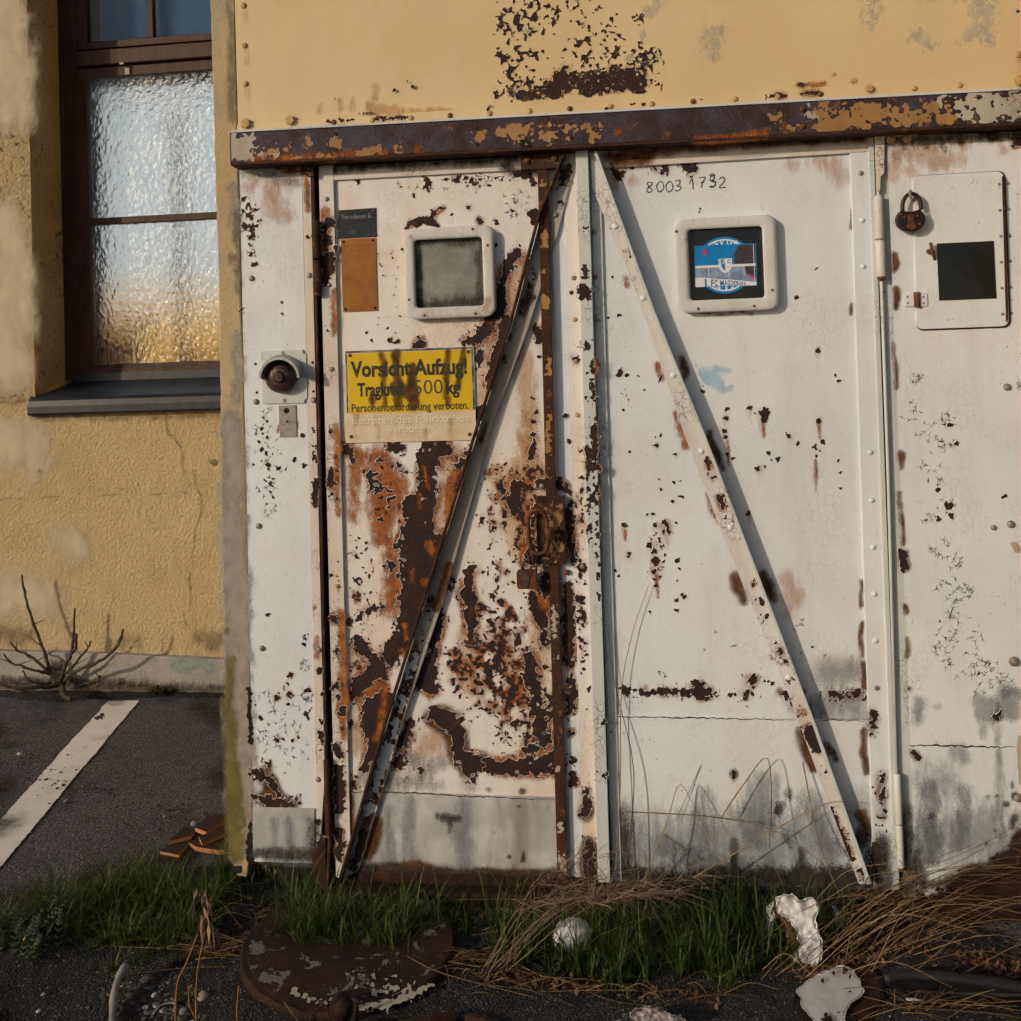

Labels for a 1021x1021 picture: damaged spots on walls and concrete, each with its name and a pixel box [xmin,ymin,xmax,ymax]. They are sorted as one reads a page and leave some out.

peeling [486,0,664,112]
peeling [466,119,604,146]
rust [302,173,331,255]
rust [673,411,689,449]
crack [150,416,202,628]
rust [534,474,580,567]
rust [333,424,550,875]
water stain [0,657,319,863]
water stain [436,813,460,831]
water stain [357,852,557,877]
water stain [610,805,965,905]
water stain [978,735,1021,872]